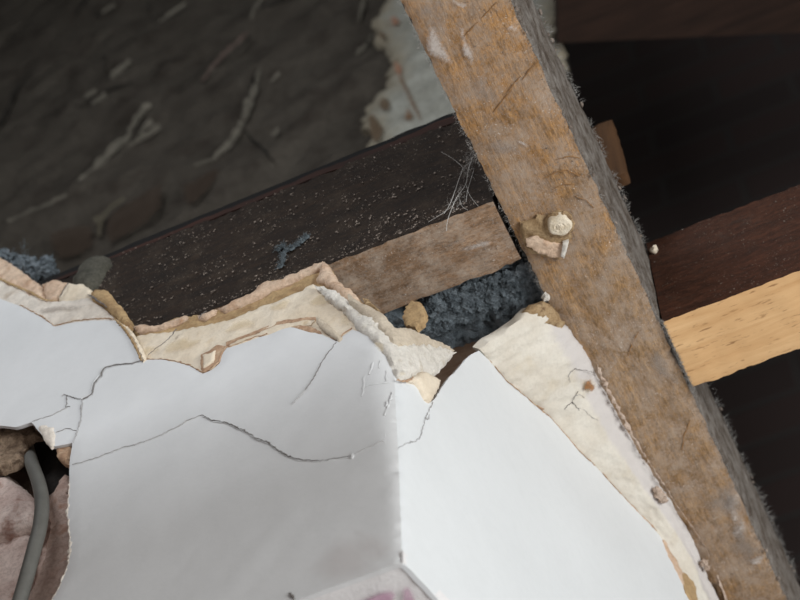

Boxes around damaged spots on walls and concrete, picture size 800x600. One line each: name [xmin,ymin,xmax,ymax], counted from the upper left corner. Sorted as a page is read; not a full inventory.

crack [32,329,177,441]
spalling [0,258,456,403]
crack [72,402,433,465]
crack [292,342,337,404]
spalling [473,301,727,600]